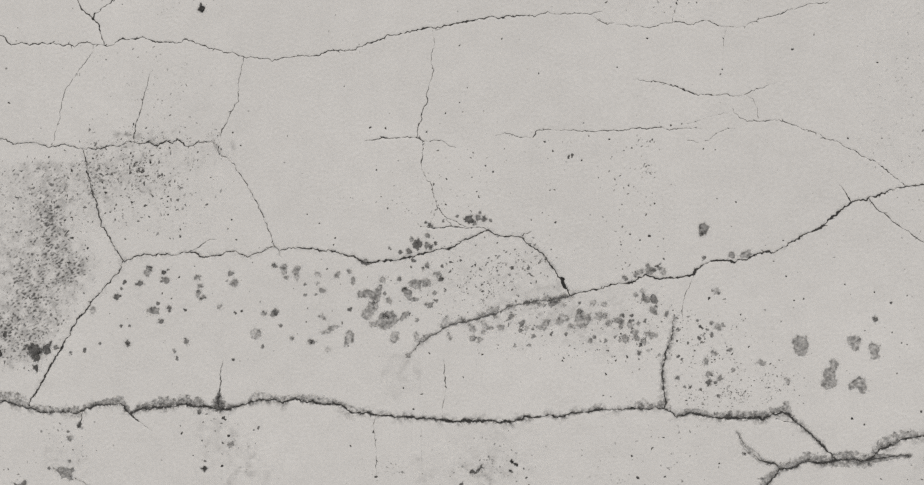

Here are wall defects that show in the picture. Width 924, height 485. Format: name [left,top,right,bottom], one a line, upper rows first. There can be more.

crack [0,0,550,110]
crack [373,41,454,169]
crack [500,121,701,141]
crack [646,80,730,96]
crack [631,0,830,45]
crack [2,74,249,415]
crack [177,142,924,310]
crack [413,312,498,351]
crack [60,319,924,485]